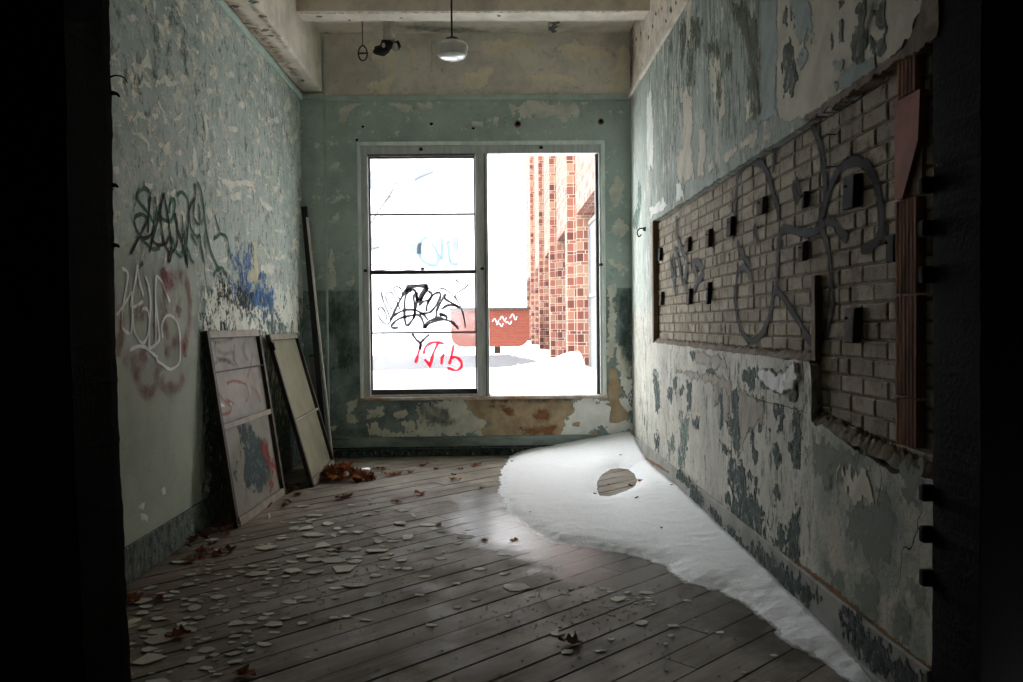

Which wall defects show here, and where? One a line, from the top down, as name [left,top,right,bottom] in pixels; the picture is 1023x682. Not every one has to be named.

peeling [635,0,693,49]
peeling [131,49,180,88]
peeling [157,100,273,211]
peeling [367,42,433,113]
peeling [509,100,588,127]
peeling [646,90,654,170]
peeling [649,0,940,218]
flaking render [330,283,633,437]
peeling [653,350,822,608]
peeling [813,437,878,507]
peeling [823,560,927,682]